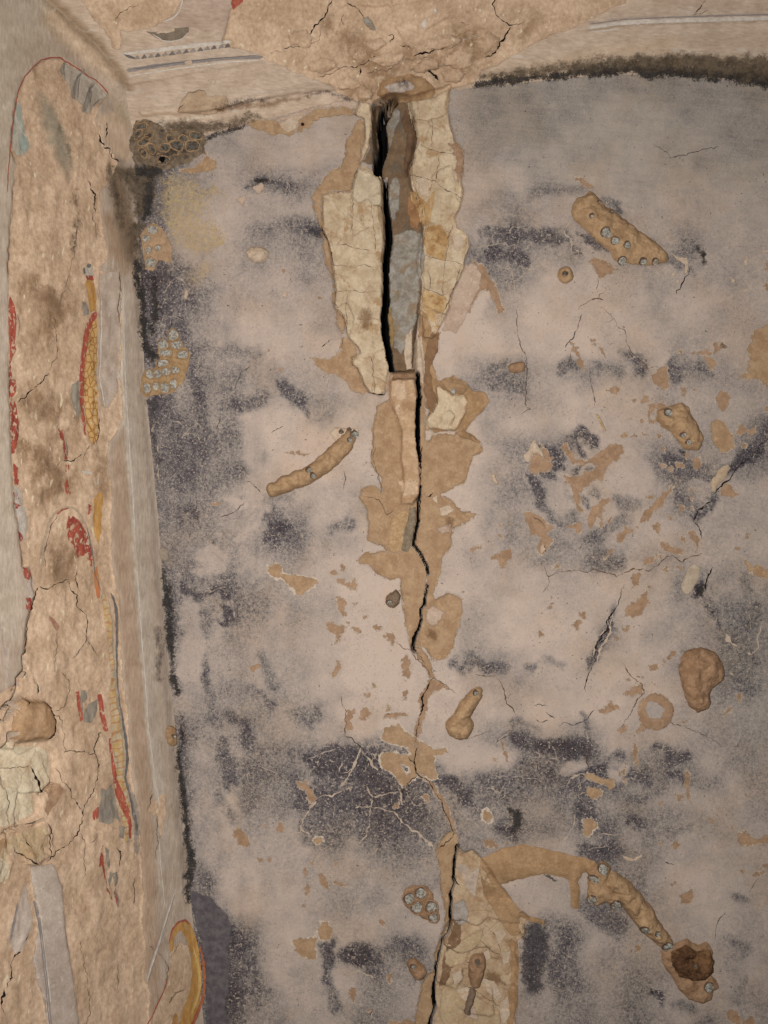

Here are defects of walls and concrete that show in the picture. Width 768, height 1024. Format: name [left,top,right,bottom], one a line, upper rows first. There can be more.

flaking render [0,59,193,1024]
damp [130,165,156,265]
damp [148,276,160,336]
crack [263,101,459,1024]
flaking render [222,0,626,1024]
crack [471,439,768,742]